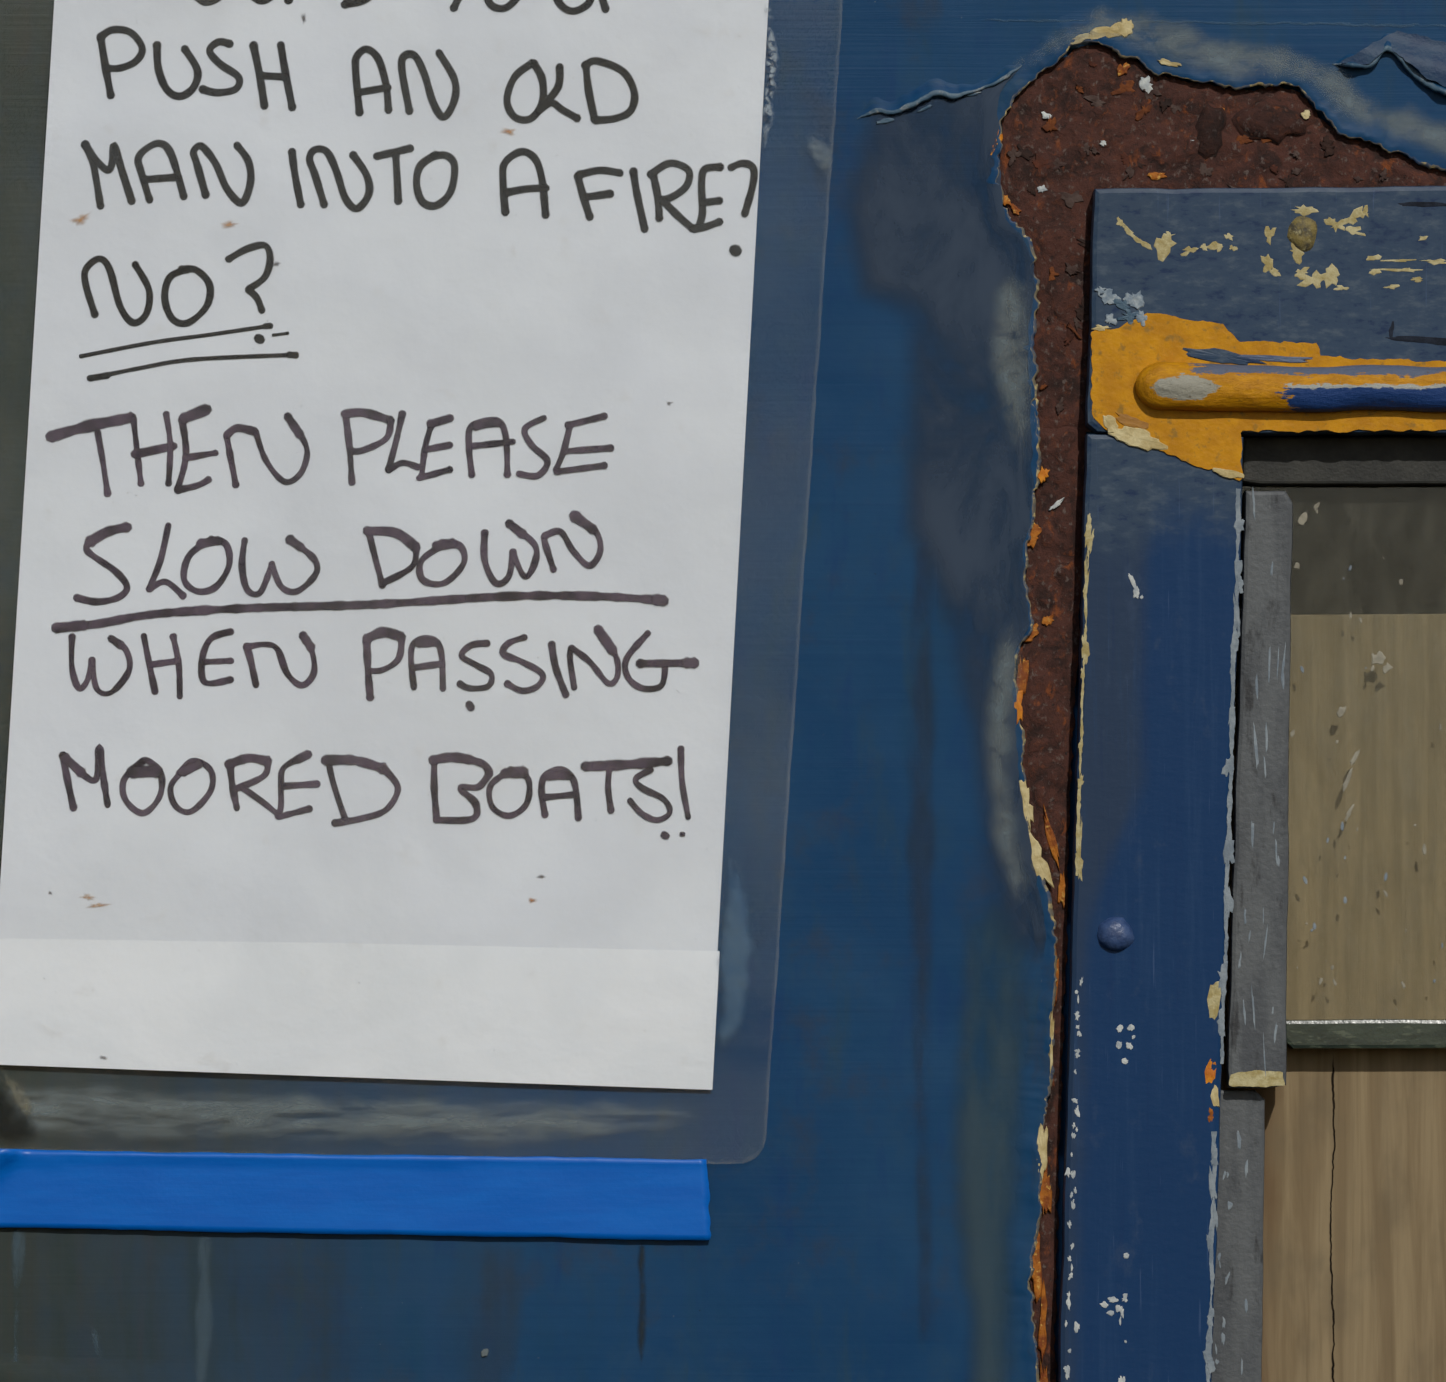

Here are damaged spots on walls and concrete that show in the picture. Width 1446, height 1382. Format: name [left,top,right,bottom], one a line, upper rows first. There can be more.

peeling [1332,31,1446,96]
spalling [1116,217,1238,262]
spalling [1261,226,1349,290]
spalling [1293,204,1368,236]
spalling [1366,254,1446,289]
corrosion [971,8,1446,1382]
peeling [1090,286,1446,1064]